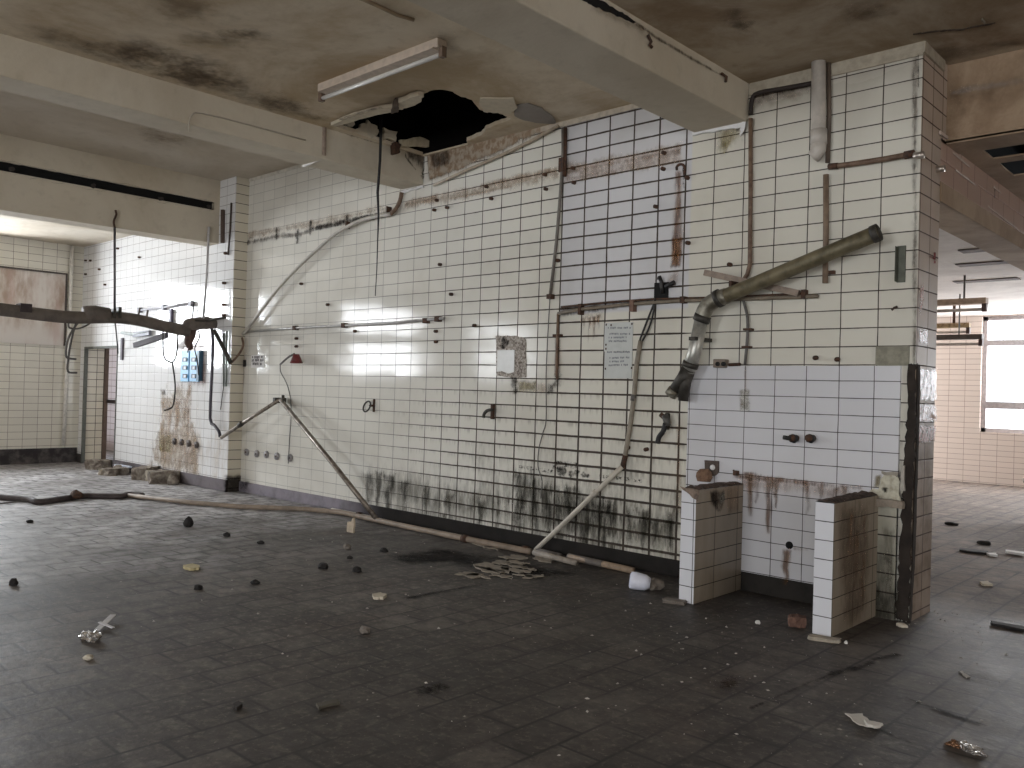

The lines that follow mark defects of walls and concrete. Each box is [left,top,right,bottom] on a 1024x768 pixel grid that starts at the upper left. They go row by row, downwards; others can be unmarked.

spalling [331,91,429,155]
flaking render [479,97,556,124]
rust [672,163,686,265]
peeling [496,335,526,378]
damp [517,476,616,539]
rust [737,473,808,531]
spalling [871,329,928,623]